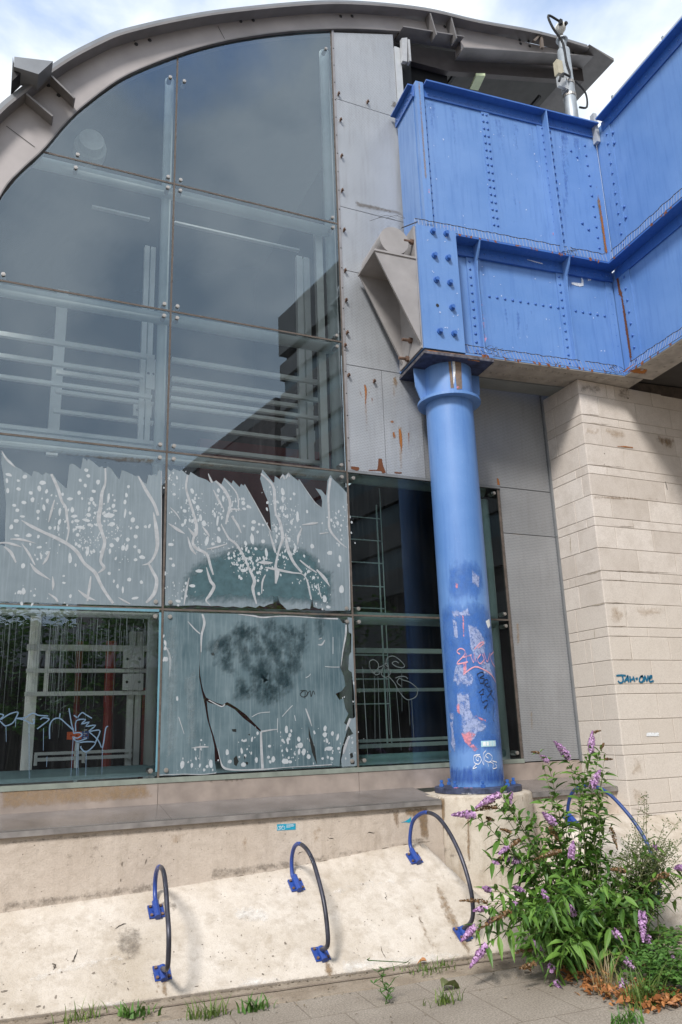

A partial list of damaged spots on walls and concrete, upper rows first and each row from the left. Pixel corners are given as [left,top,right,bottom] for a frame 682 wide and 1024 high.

corrosion [589,198,630,263]
corrosion [448,354,489,389]
corrosion [351,459,402,474]